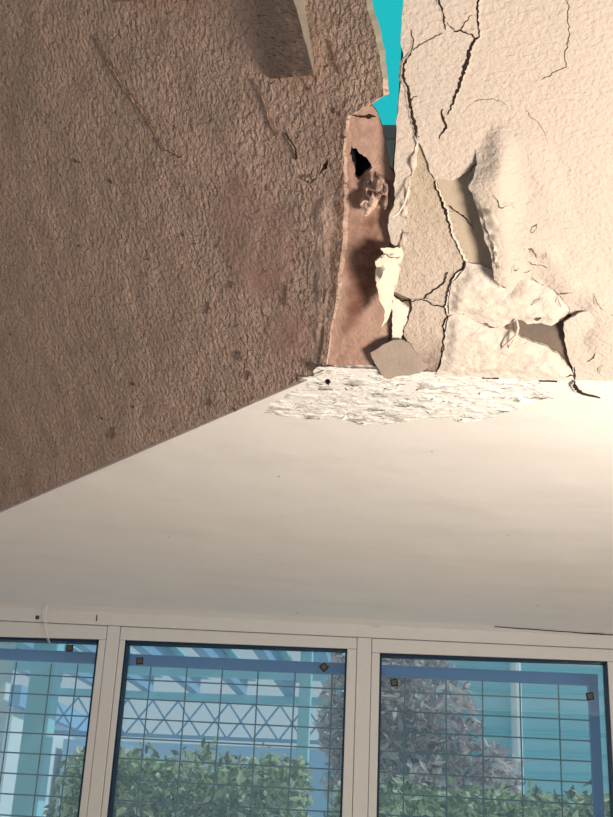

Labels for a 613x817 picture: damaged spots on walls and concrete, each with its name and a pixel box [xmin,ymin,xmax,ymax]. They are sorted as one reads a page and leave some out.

crack [96,38,182,159]
crack [252,80,316,183]
crack [398,0,506,139]
crack [543,0,571,79]
leakage [349,240,380,322]
peeling [264,135,553,426]
crack [394,181,473,369]
crack [539,367,600,398]